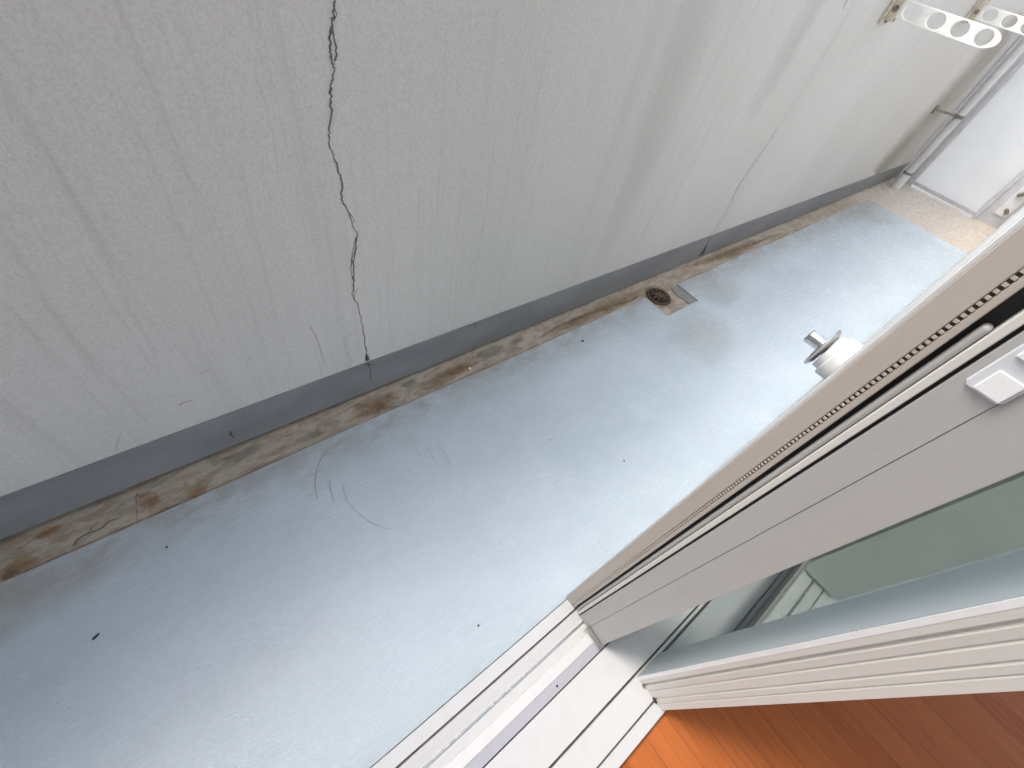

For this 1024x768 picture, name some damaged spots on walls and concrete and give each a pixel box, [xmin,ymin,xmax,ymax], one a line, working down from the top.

crack [328,0,371,379]